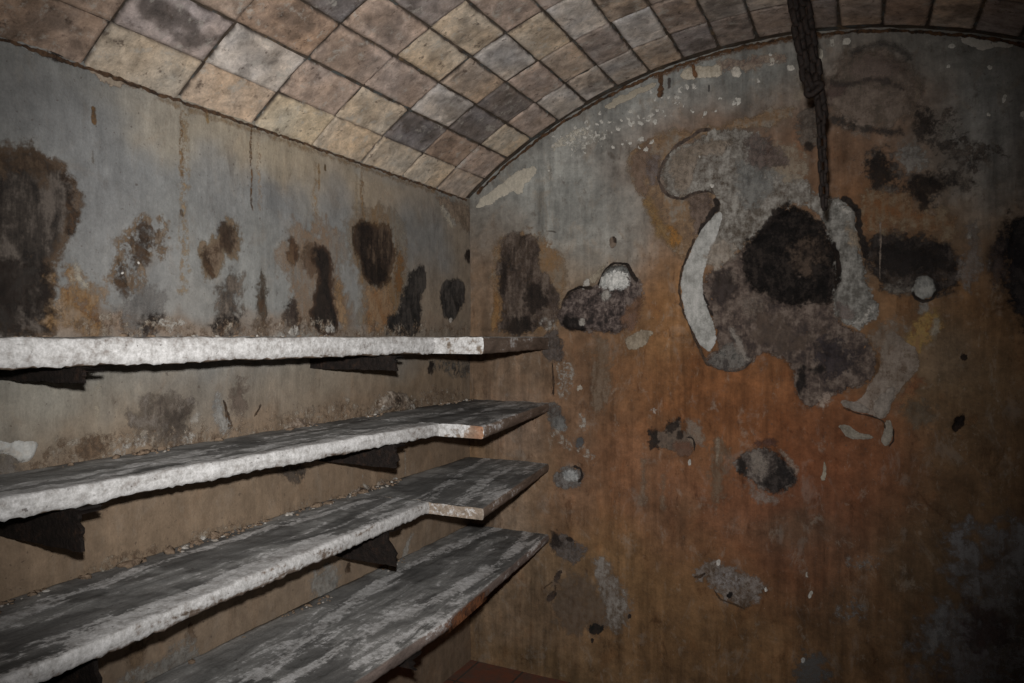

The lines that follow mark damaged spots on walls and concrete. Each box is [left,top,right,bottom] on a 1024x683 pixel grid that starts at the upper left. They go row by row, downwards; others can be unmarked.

water stain [0,140,84,337]
water stain [198,216,269,337]
water stain [283,237,339,335]
water stain [352,219,398,288]
water stain [386,265,426,337]
peeling [436,166,550,232]
water stain [489,227,568,363]
flaking render [660,128,919,446]
flaking render [863,222,966,313]
flaking render [647,417,705,465]
flaking render [732,438,798,503]
flaking render [694,559,767,609]